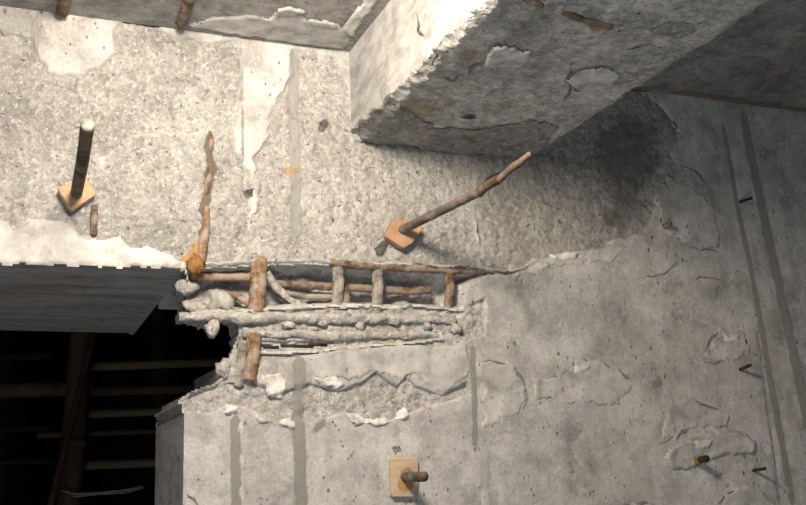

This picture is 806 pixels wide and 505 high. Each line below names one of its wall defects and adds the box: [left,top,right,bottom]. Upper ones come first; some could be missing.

spalling [0,0,721,429]
crack [703,331,723,364]